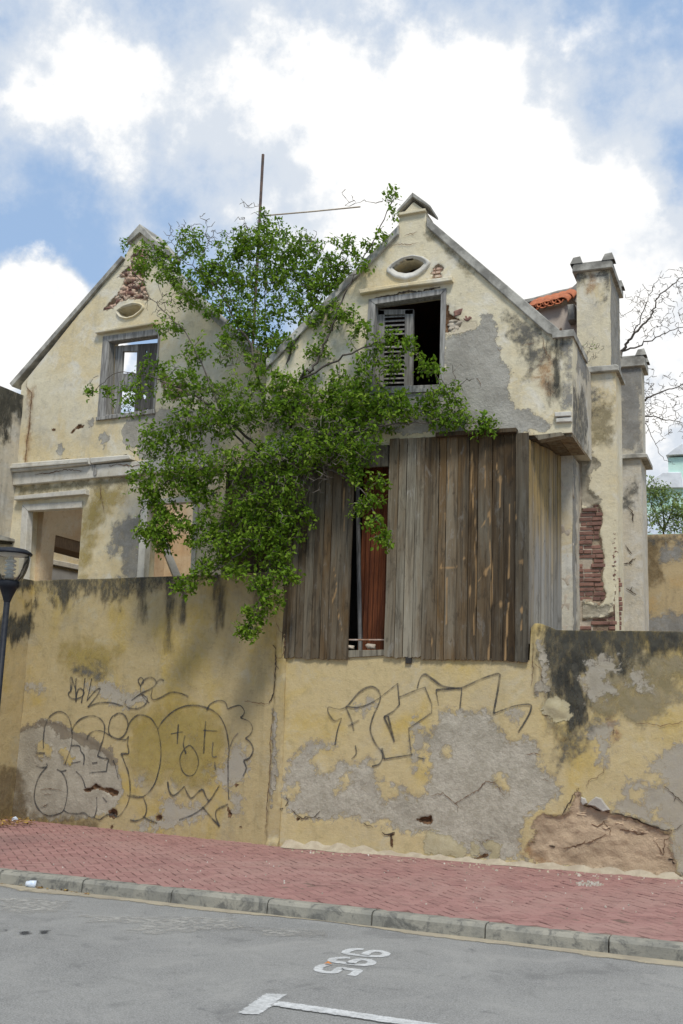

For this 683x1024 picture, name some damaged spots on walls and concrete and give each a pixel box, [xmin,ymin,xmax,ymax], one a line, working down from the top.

flaking render [103,250,149,310]
flaking render [430,264,444,279]
peeling [344,304,552,436]
leakage [505,269,683,762]
flaking render [579,451,623,631]
leakage [0,574,224,644]
peeling [577,653,656,702]
peeling [13,718,149,829]
peeling [133,777,208,833]
peeling [202,743,251,827]
crack [433,780,500,810]
peeling [269,706,683,875]